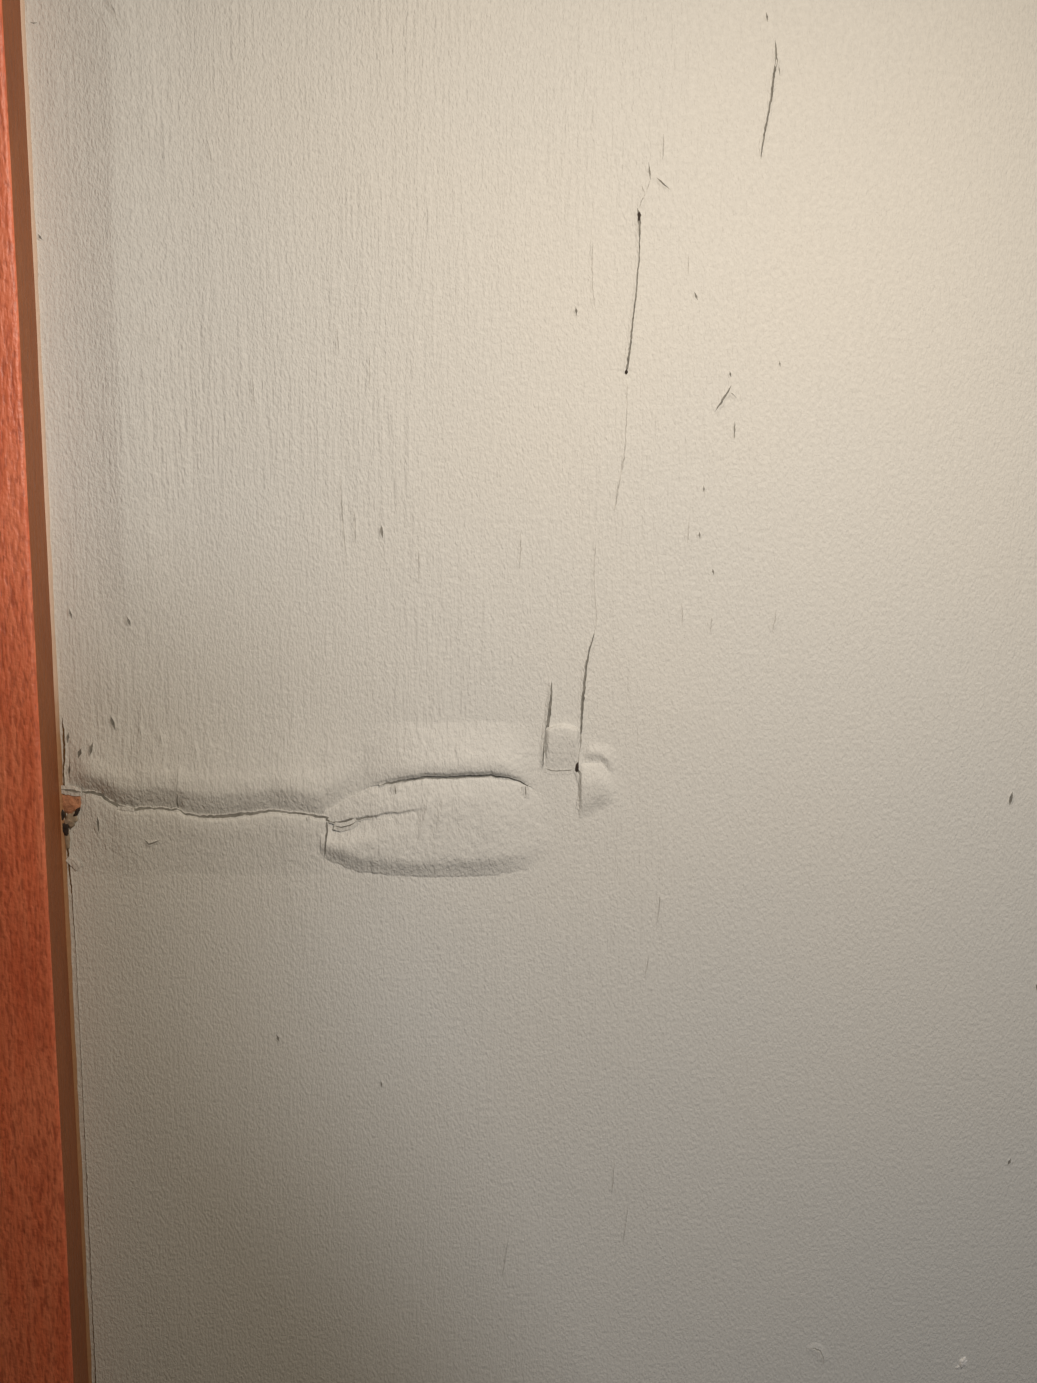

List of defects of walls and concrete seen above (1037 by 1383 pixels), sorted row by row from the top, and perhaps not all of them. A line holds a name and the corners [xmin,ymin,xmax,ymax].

crack [60,631,598,1383]